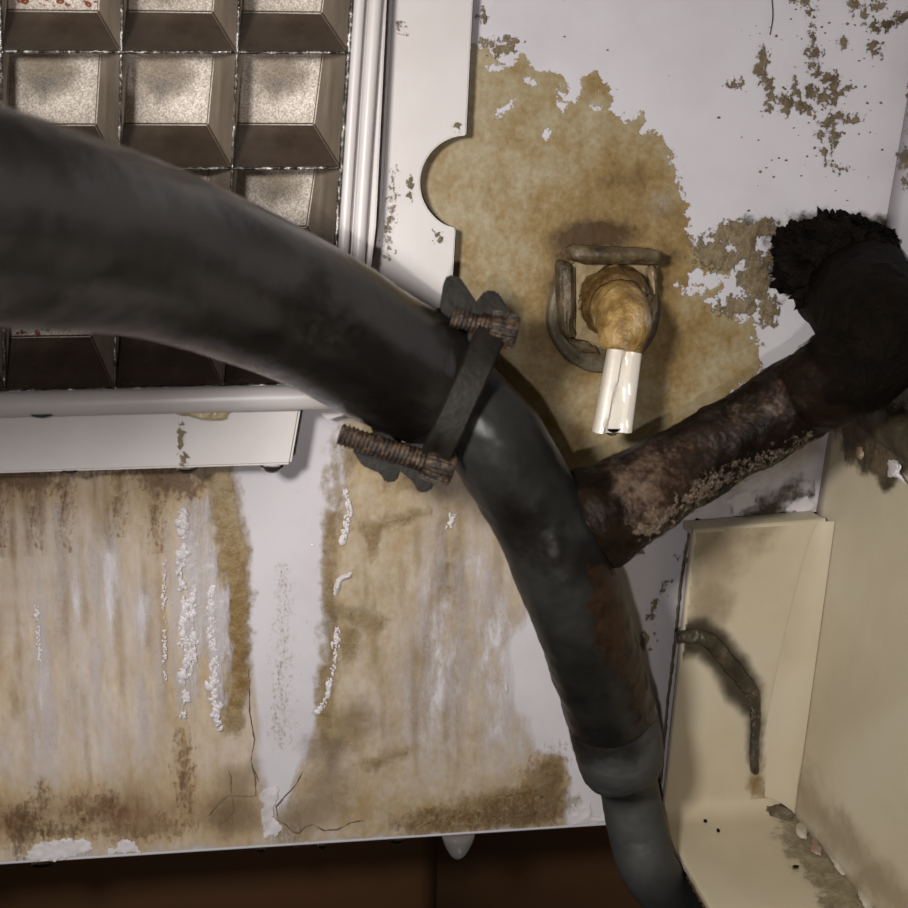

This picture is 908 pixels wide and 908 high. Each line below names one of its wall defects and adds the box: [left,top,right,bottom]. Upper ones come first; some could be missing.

damp [846,0,908,60]
damp [726,0,864,176]
damp [420,34,908,471]
damp [345,415,372,433]
damp [0,442,577,862]
damp [640,580,673,651]
crack [209,671,259,824]
crack [275,773,364,834]
mould [779,817,874,908]